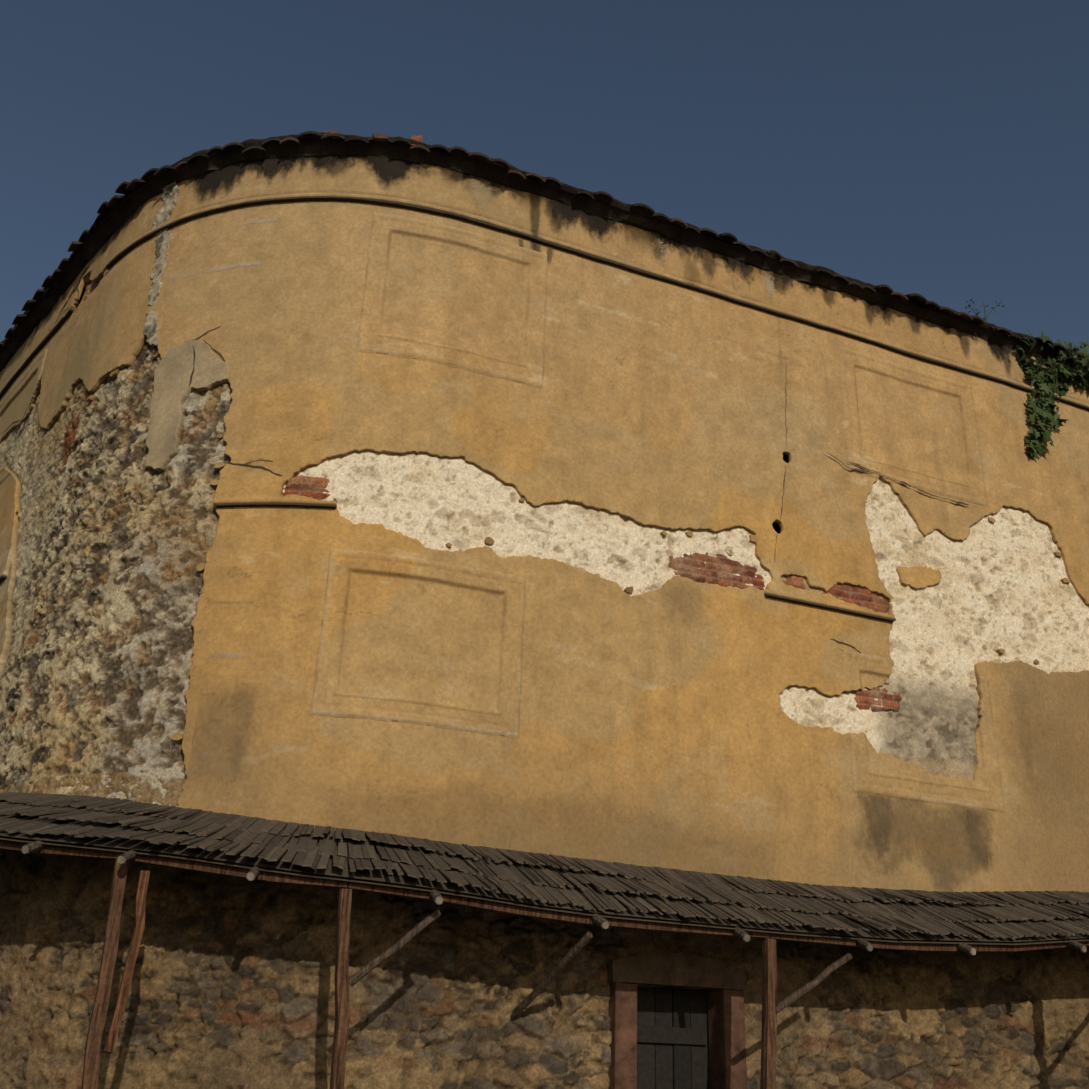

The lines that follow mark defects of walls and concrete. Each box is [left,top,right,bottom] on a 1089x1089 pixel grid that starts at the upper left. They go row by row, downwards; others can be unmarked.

water stain [190,154,420,200]
water stain [462,174,491,206]
water stain [552,200,618,237]
water stain [659,234,815,293]
water stain [867,300,891,319]
crack [774,360,787,561]
flaking render [0,341,232,807]
flaking render [282,451,1089,780]